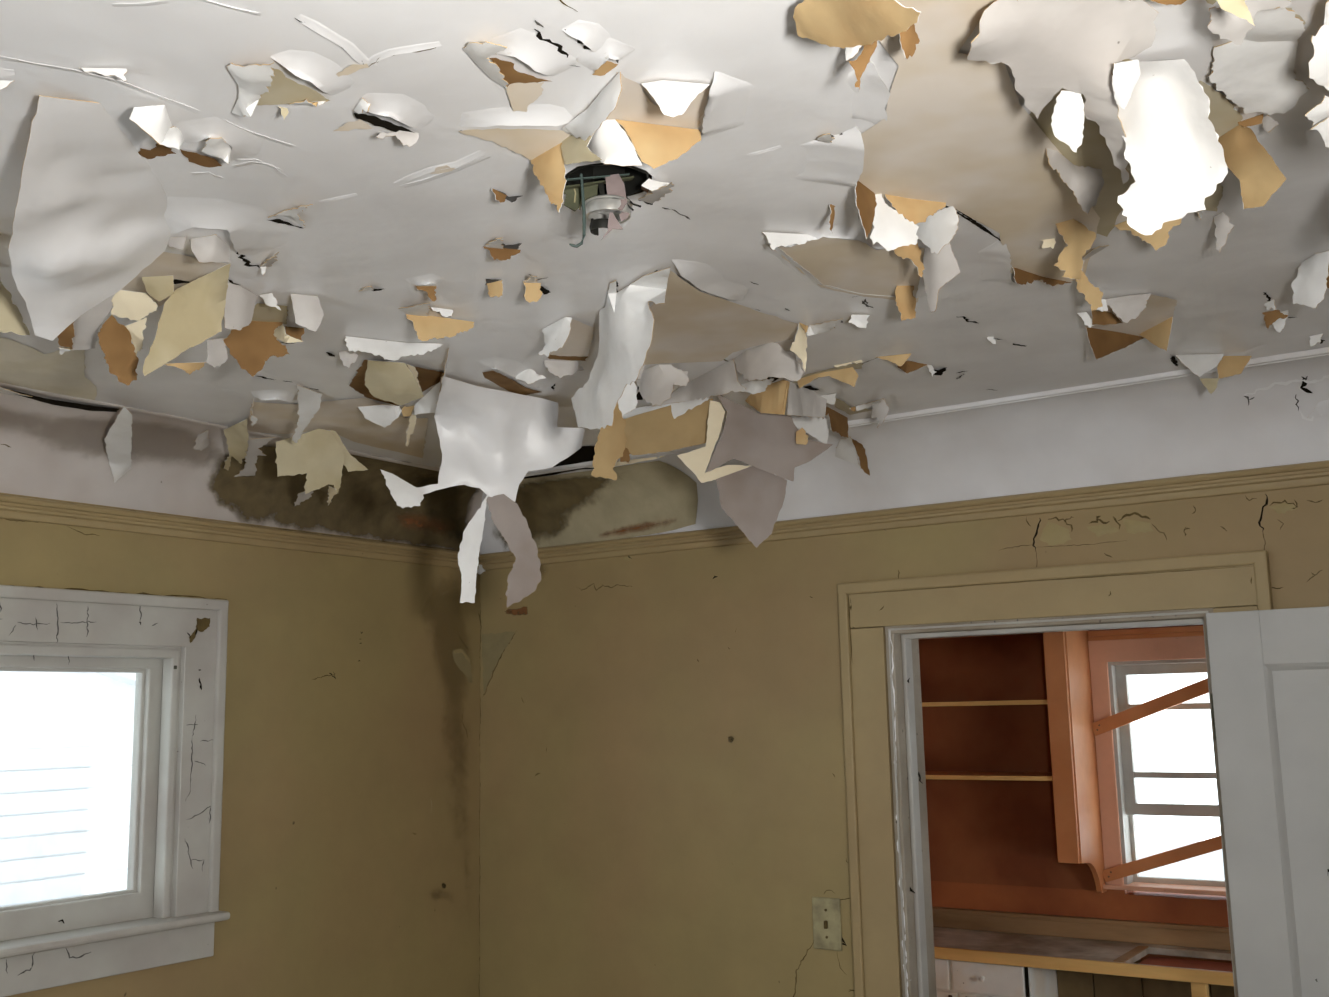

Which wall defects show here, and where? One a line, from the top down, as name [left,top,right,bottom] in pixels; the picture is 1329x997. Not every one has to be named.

peeling [227,50,369,119]
peeling [459,38,755,212]
peeling [759,0,1329,394]
peeling [0,95,927,622]
water stain [209,445,479,552]
water stain [515,461,718,548]
crack [1000,518,1117,567]
crack [1246,494,1268,550]
crack [0,604,94,665]
peeling [187,618,210,643]
crack [185,716,211,868]
crack [793,938,853,997]